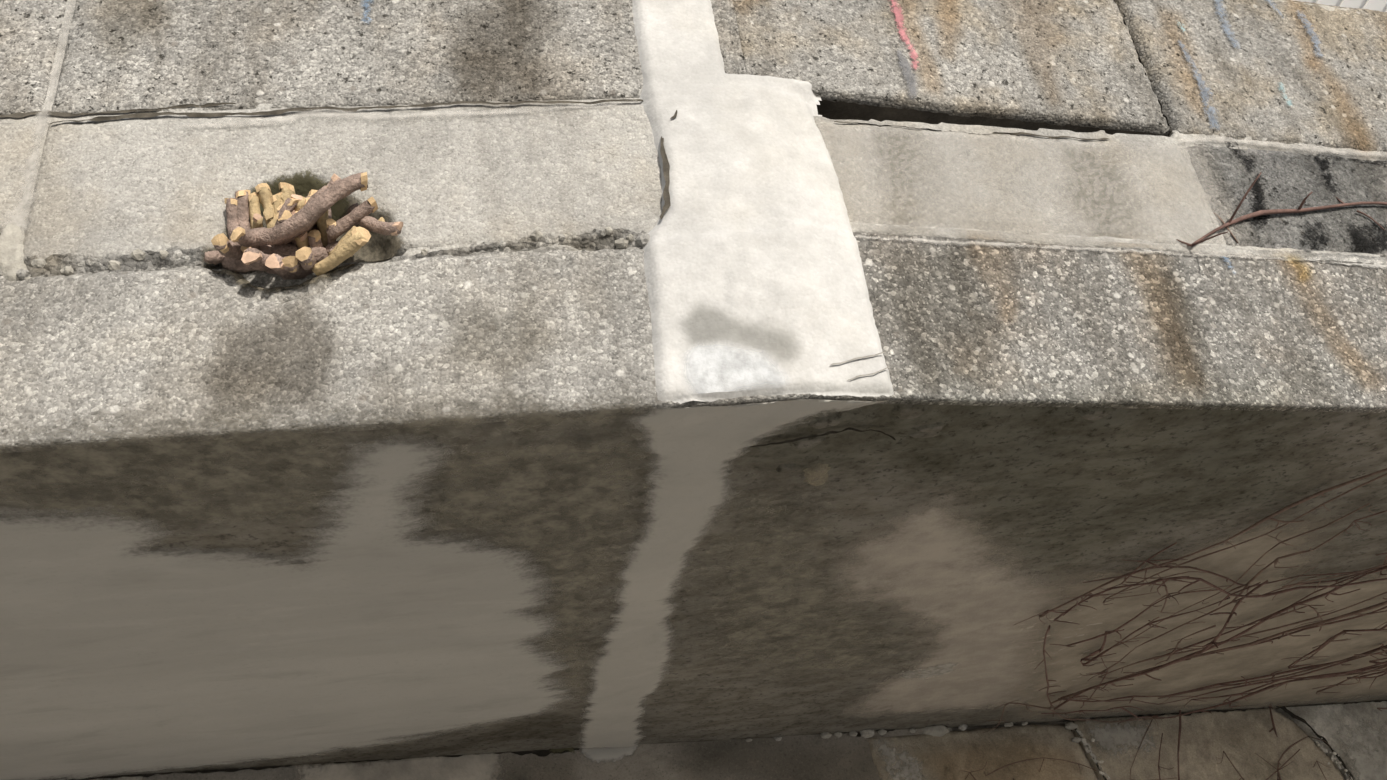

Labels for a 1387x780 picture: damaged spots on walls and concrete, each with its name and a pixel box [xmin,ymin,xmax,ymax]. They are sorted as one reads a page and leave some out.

spalling [249,170,329,228]
spalling [16,195,650,293]
crack [0,99,677,219]
mould [1226,136,1270,229]
water stain [1301,219,1387,268]
water stain [0,397,646,687]
water stain [707,494,901,675]